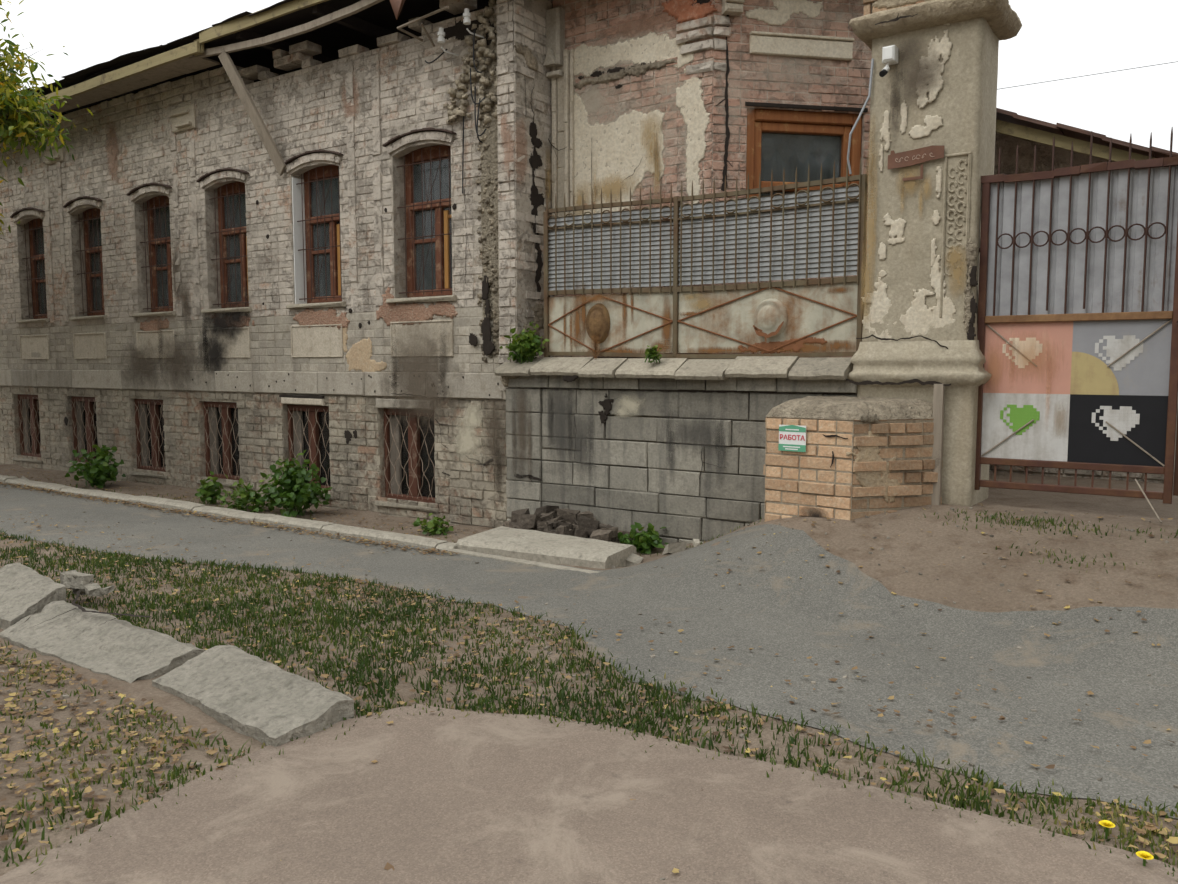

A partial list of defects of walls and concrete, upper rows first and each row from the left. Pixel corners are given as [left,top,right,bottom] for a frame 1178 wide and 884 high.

peeling [872,0,930,9]
spalling [578,62,646,89]
flaking render [879,23,952,172]
flaking render [861,166,979,341]
peeling [293,307,387,393]
spalling [376,287,458,326]
rust [564,294,709,357]
rust [777,340,851,353]